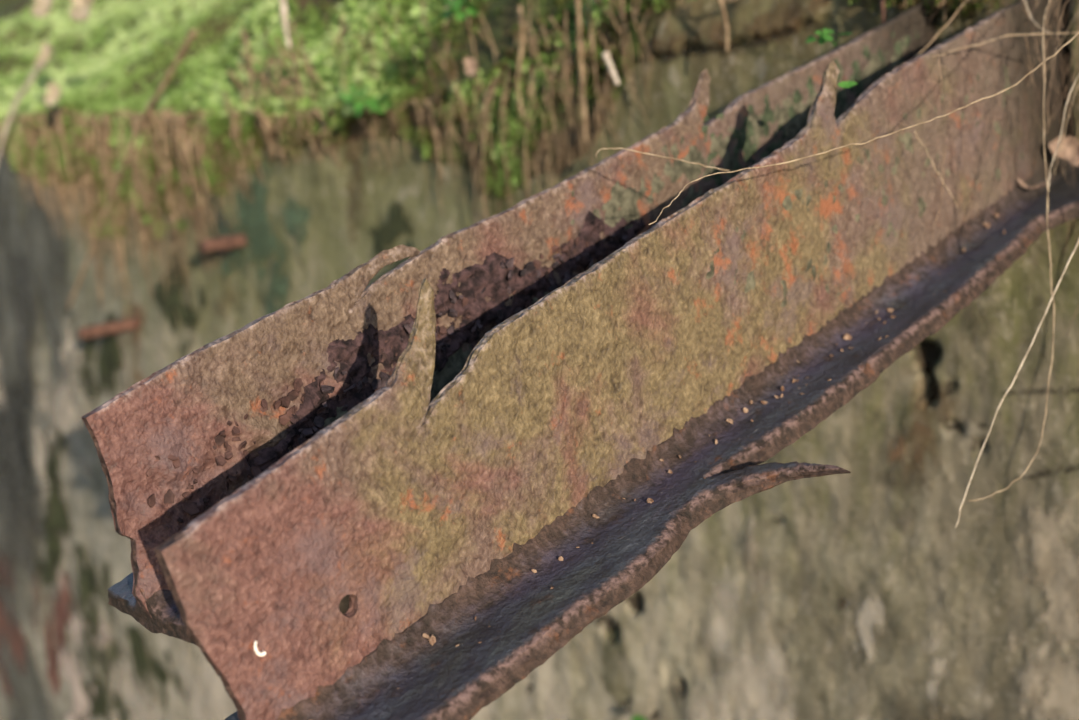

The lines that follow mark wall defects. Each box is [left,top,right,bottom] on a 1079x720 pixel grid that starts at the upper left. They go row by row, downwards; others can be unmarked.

rust [434,211,645,373]
water stain [0,147,76,619]
rust [247,314,415,473]
water stain [0,638,49,720]
water stain [59,615,95,720]